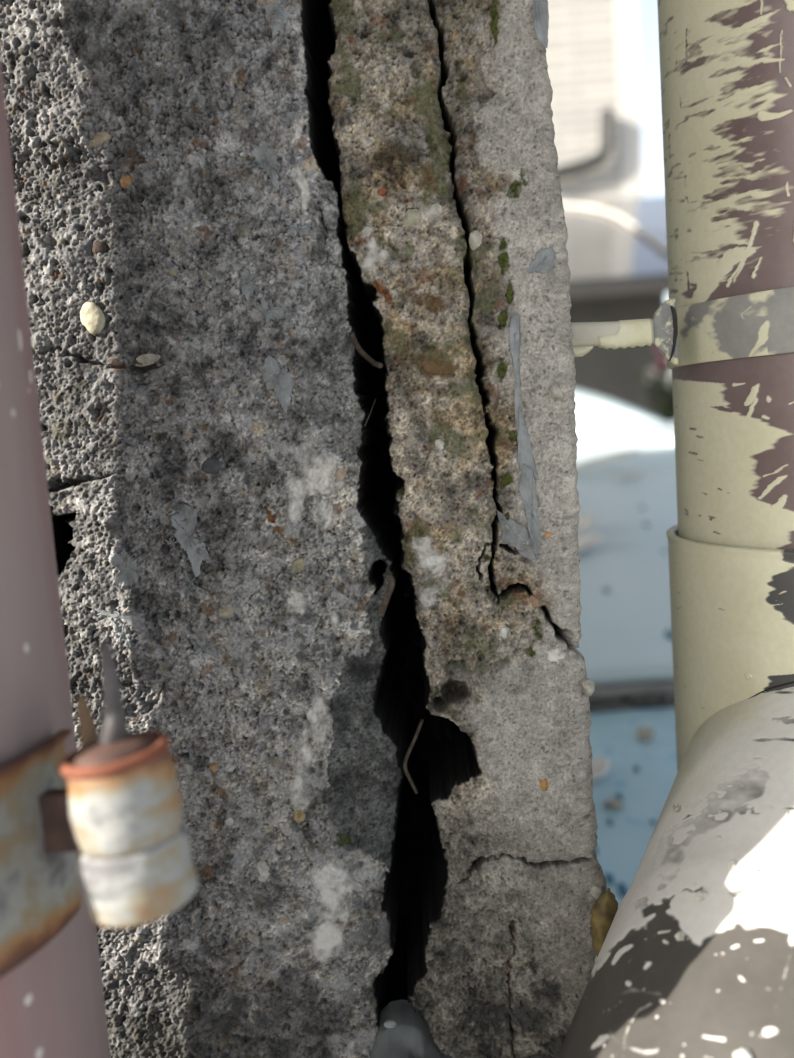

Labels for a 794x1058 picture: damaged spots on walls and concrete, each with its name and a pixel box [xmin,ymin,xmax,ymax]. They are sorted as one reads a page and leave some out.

efflorescence [361,227,395,274]
damp [414,285,448,311]
damp [418,355,454,376]
efflorescence [287,442,343,529]
crack [254,0,593,1025]
efflorescence [412,537,448,574]
damp [287,588,310,615]
efflorescence [420,589,436,607]
efflorescence [542,648,566,663]
crack [505,920,517,1058]